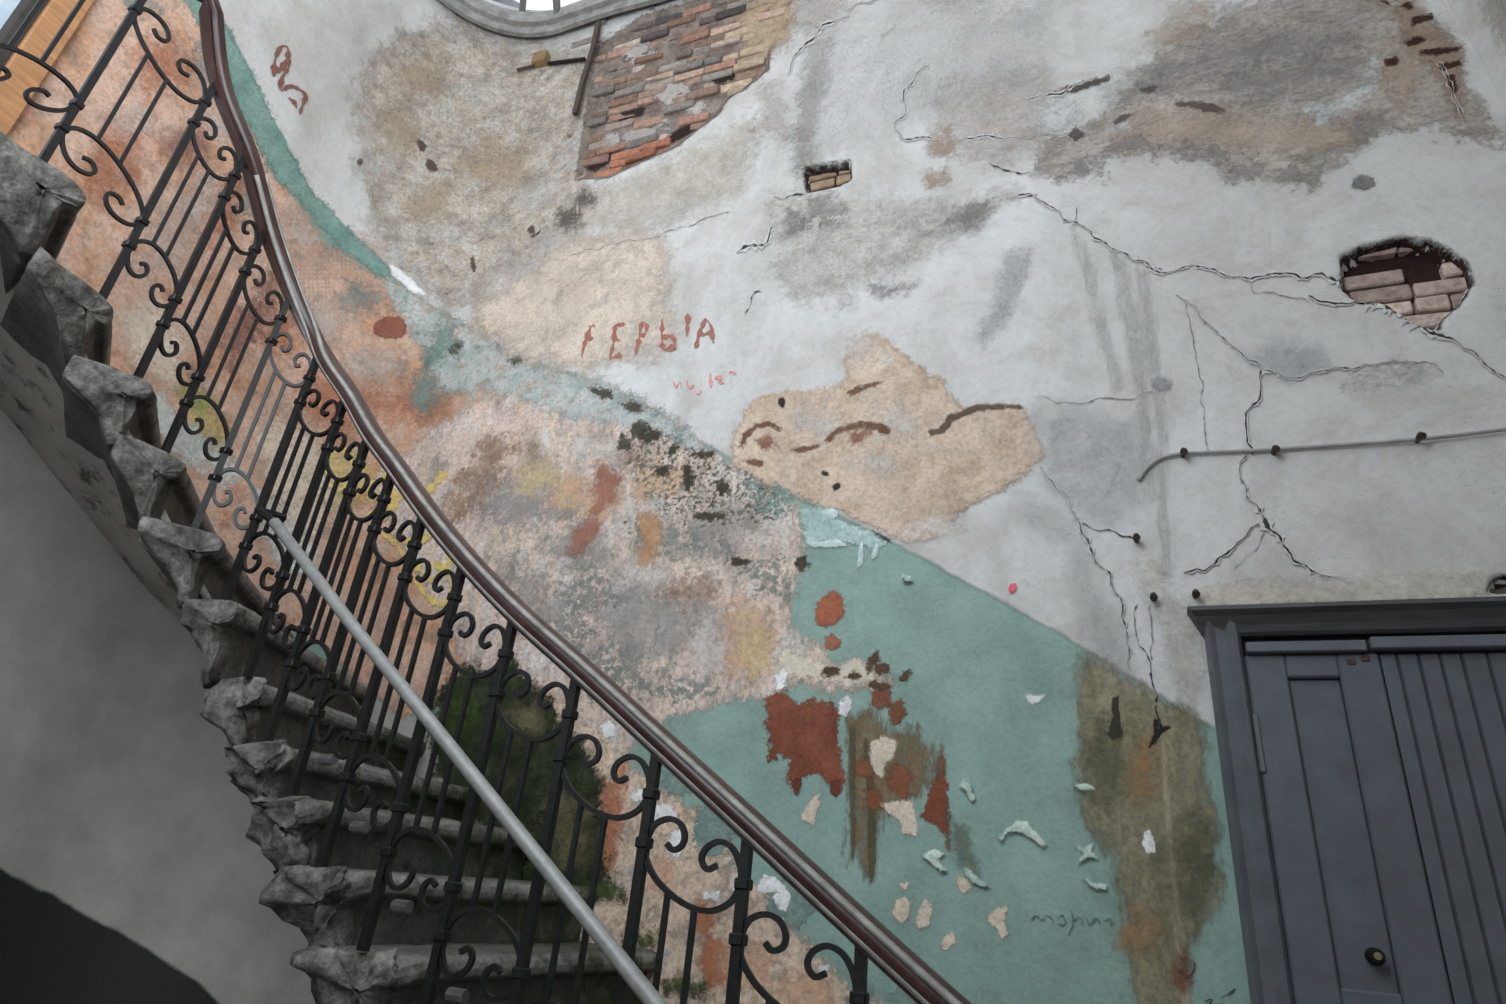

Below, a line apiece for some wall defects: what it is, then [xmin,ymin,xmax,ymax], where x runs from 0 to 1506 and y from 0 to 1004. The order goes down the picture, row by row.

peeling [8,0,1047,1004]
crack [787,0,895,75]
crack [1040,466,1161,729]
flaking render [769,0,1506,298]
leakage [1113,254,1171,455]
leakage [1070,463,1225,1004]
crack [893,61,1506,584]
spalling [1340,237,1474,330]